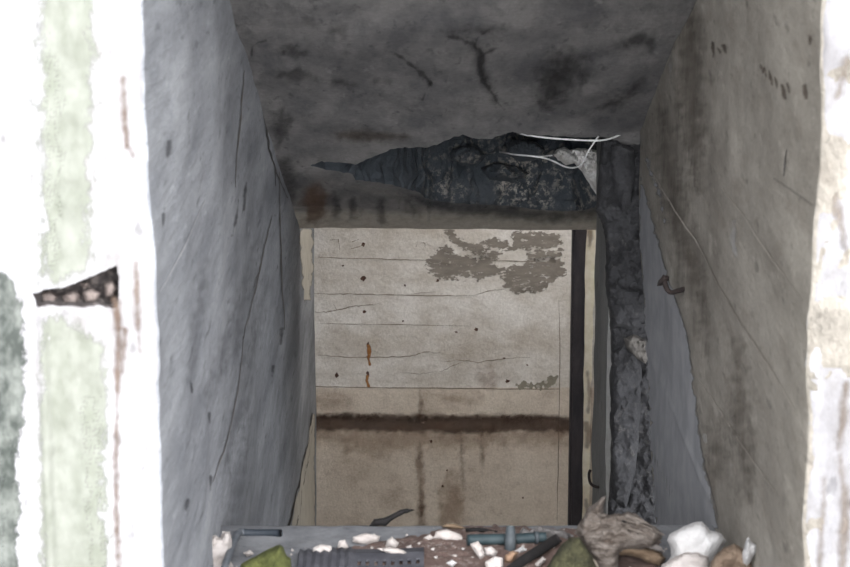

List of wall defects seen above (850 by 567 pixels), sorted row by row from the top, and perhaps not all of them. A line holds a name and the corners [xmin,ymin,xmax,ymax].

leakage [316,414,569,433]
spalling [311,132,718,528]